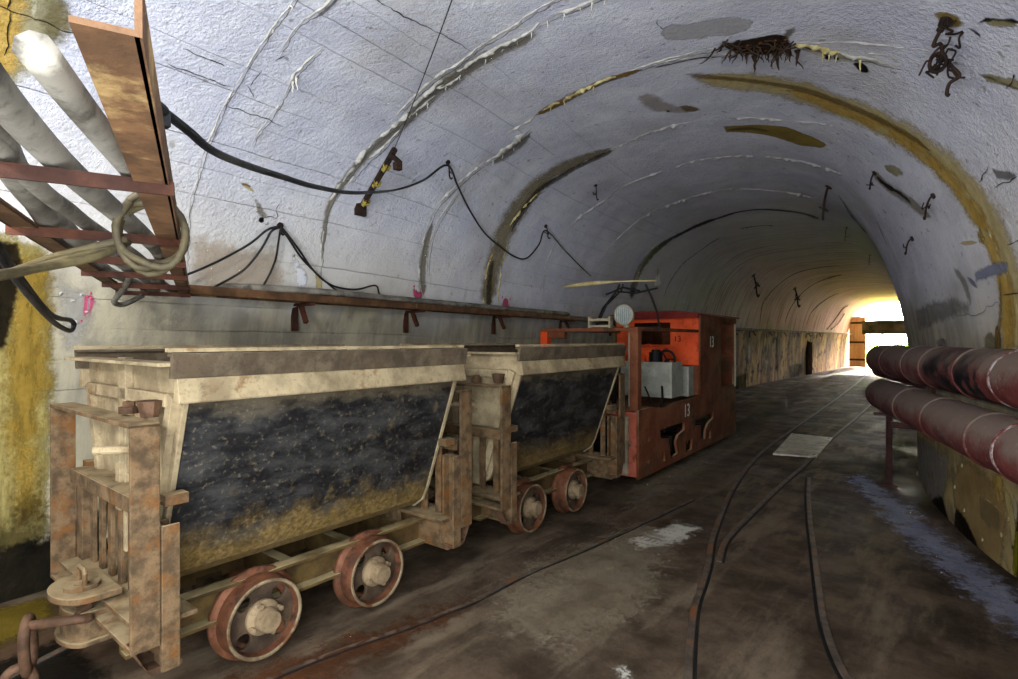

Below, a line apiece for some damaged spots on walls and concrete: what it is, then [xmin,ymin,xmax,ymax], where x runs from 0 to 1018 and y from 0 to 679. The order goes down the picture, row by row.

damp [0,0,70,83]
crack [0,0,73,56]
crack [377,0,470,51]
spalling [700,29,812,73]
crack [169,0,337,273]
damp [418,69,642,298]
damp [630,209,819,298]
damp [916,262,1008,329]
damp [985,329,1000,349]
damp [845,436,1018,638]